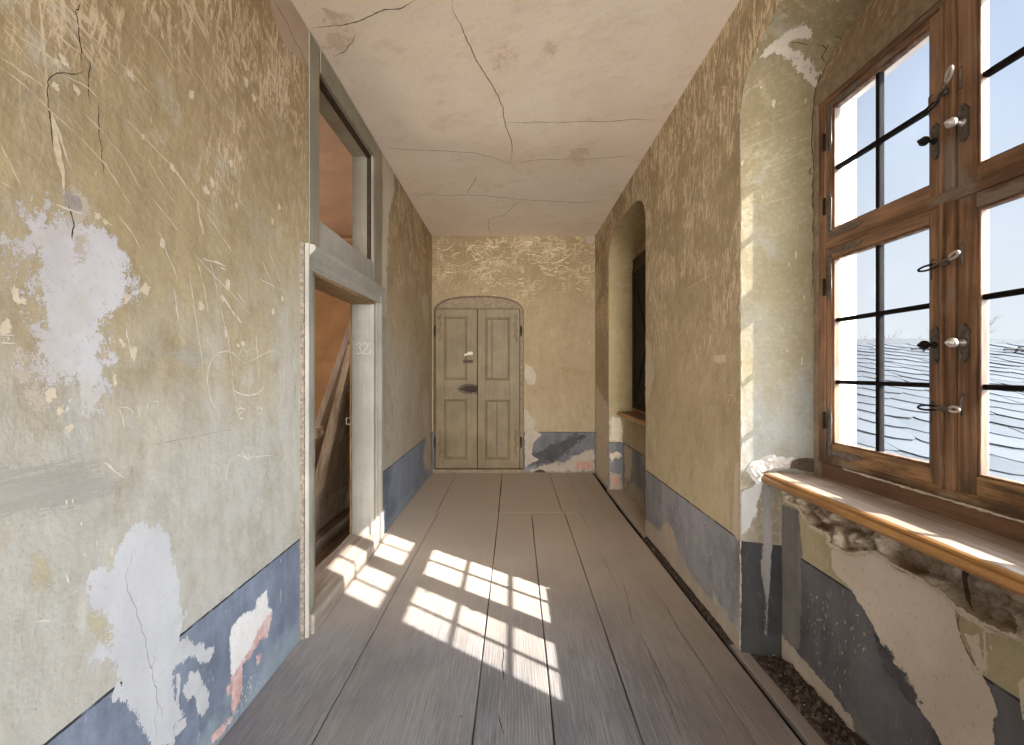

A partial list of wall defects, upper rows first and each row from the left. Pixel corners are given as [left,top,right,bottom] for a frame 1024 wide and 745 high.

crack [277,2,411,66]
crack [47,3,104,171]
crack [388,7,642,231]
spalling [64,190,108,225]
peeling [0,319,12,336]
peeling [10,285,27,306]
peeling [45,386,74,434]
damp [530,449,595,473]
spalling [782,491,1024,646]
crack [126,544,162,738]
flaking render [782,635,856,732]
peeling [174,717,187,736]